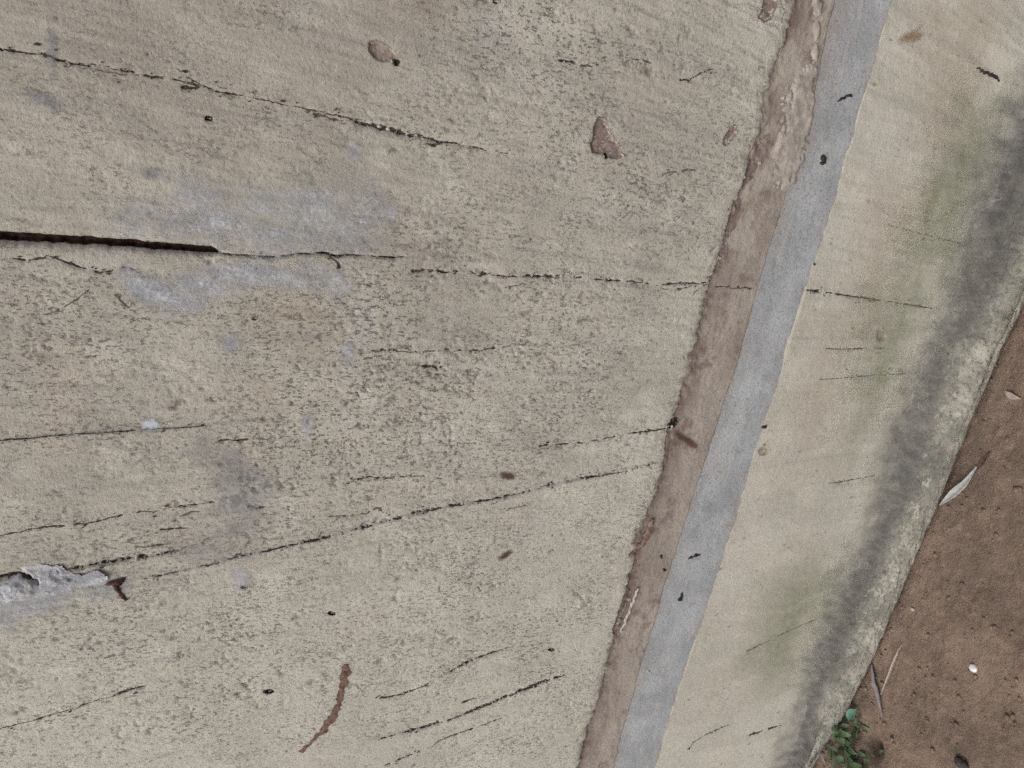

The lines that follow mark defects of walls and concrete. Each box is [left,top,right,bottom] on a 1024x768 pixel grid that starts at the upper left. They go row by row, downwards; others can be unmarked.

crack [0,43,510,157]
crack [2,255,141,315]
crack [412,266,754,295]
crack [0,424,248,444]
crack [538,425,673,449]
crack [0,463,656,584]
rust [105,576,129,602]
crack [376,647,511,699]
rust [298,665,352,753]
crack [378,674,565,766]